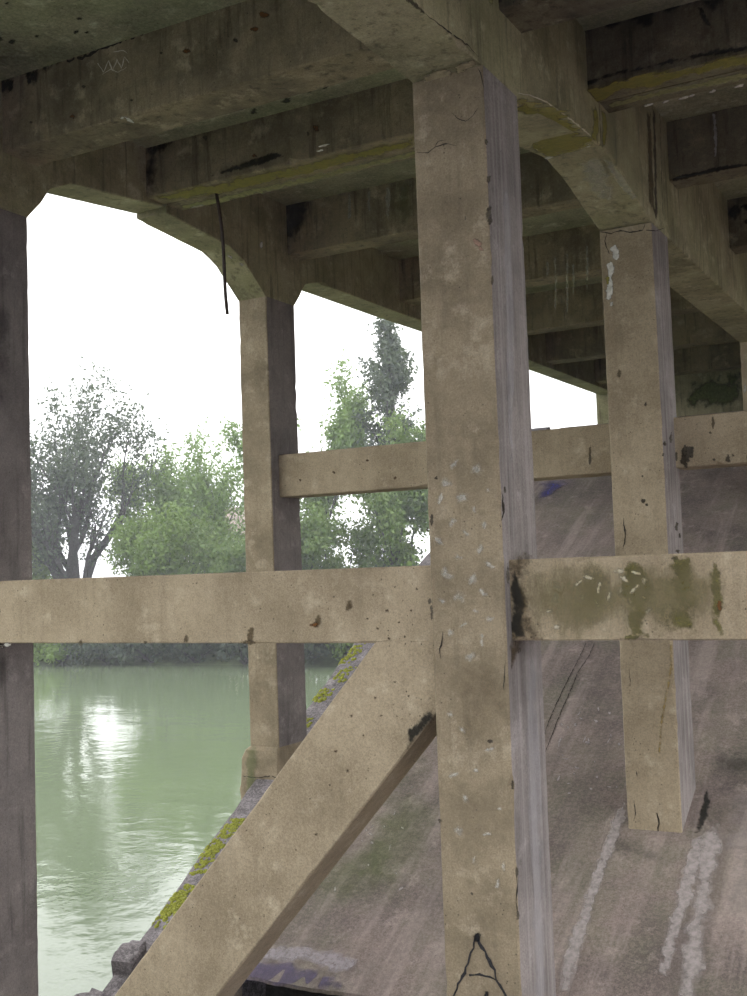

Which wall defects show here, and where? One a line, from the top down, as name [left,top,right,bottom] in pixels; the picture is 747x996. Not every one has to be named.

leakage [710,563,723,635]
leakage [561,807,626,990]
leakage [660,791,722,996]